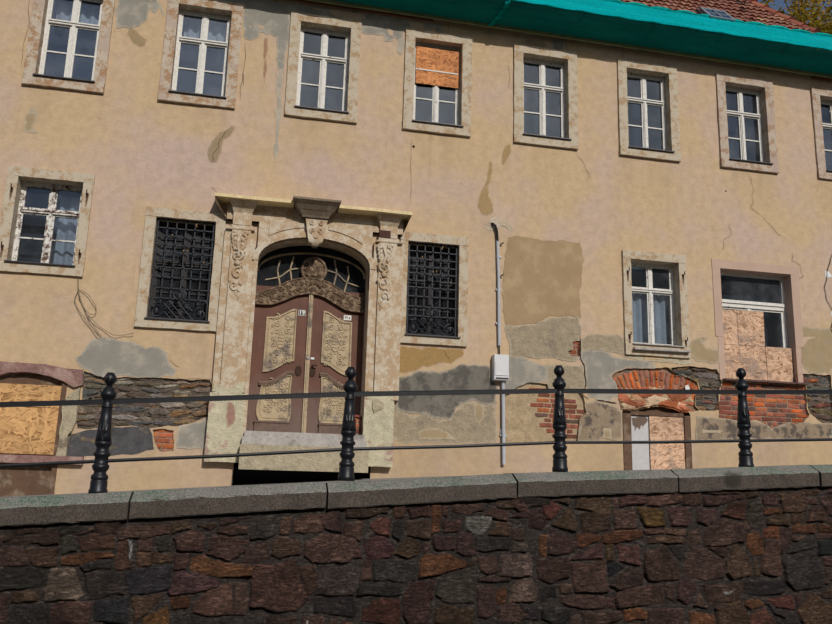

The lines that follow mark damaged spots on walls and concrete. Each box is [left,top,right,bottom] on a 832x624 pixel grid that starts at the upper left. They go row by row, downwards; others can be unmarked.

flaking render [115,0,165,29]
flaking render [218,0,444,160]
flaking render [75,337,212,451]
flaking render [393,317,832,444]